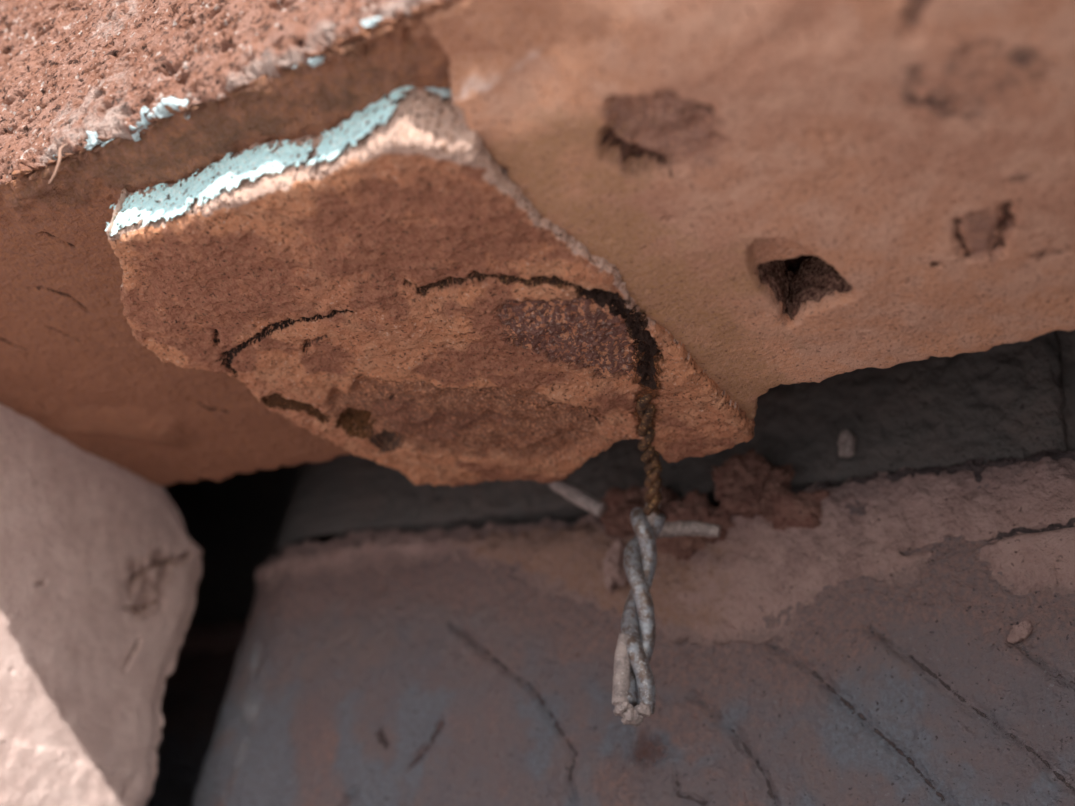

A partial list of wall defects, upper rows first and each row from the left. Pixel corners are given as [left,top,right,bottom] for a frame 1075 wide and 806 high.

spalling [601,90,715,178]
spalling [954,202,1015,257]
crack [213,309,354,377]
crack [404,271,663,390]
rust [631,341,664,437]